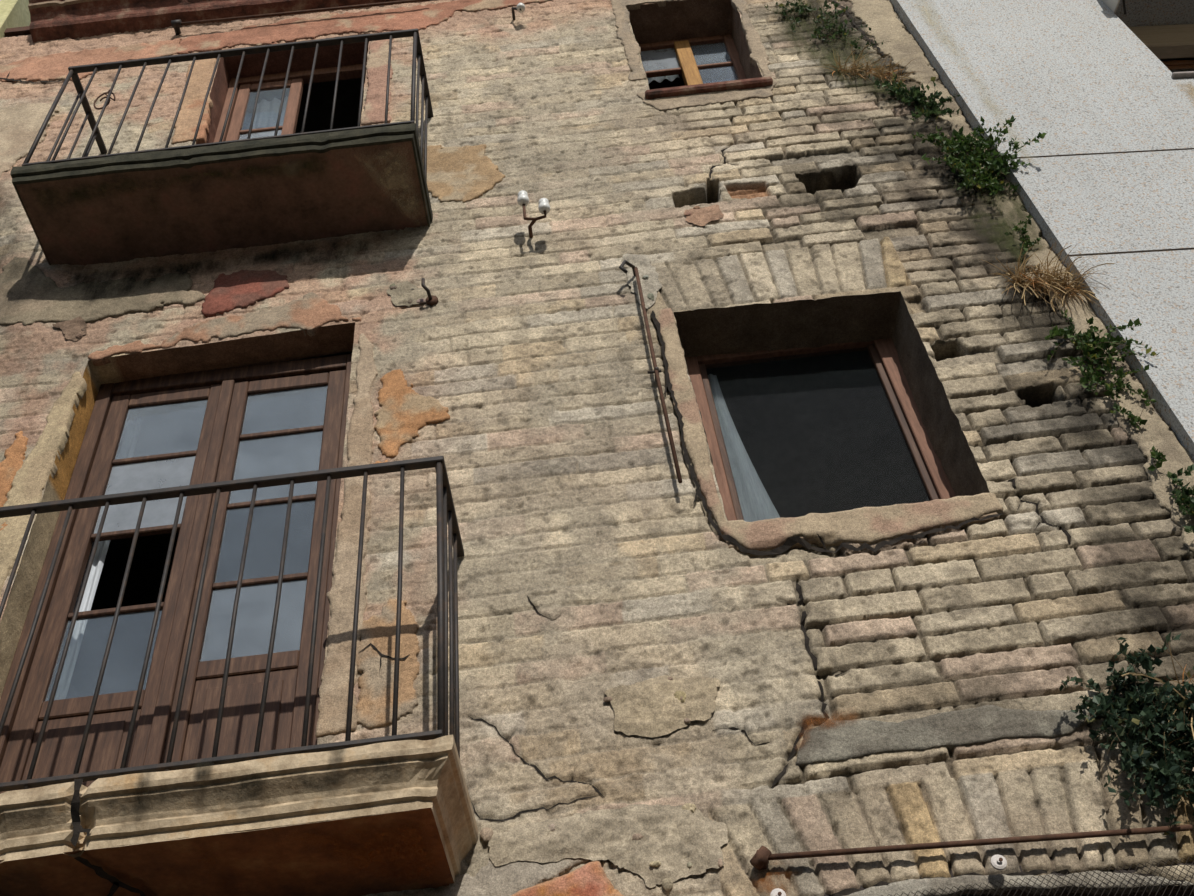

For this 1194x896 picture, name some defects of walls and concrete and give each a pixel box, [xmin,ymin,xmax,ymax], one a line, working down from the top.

peeling [423,144,505,203]
peeling [0,256,450,738]
crack [469,716,604,821]
crack [70,779,146,896]
spalling [413,803,728,896]